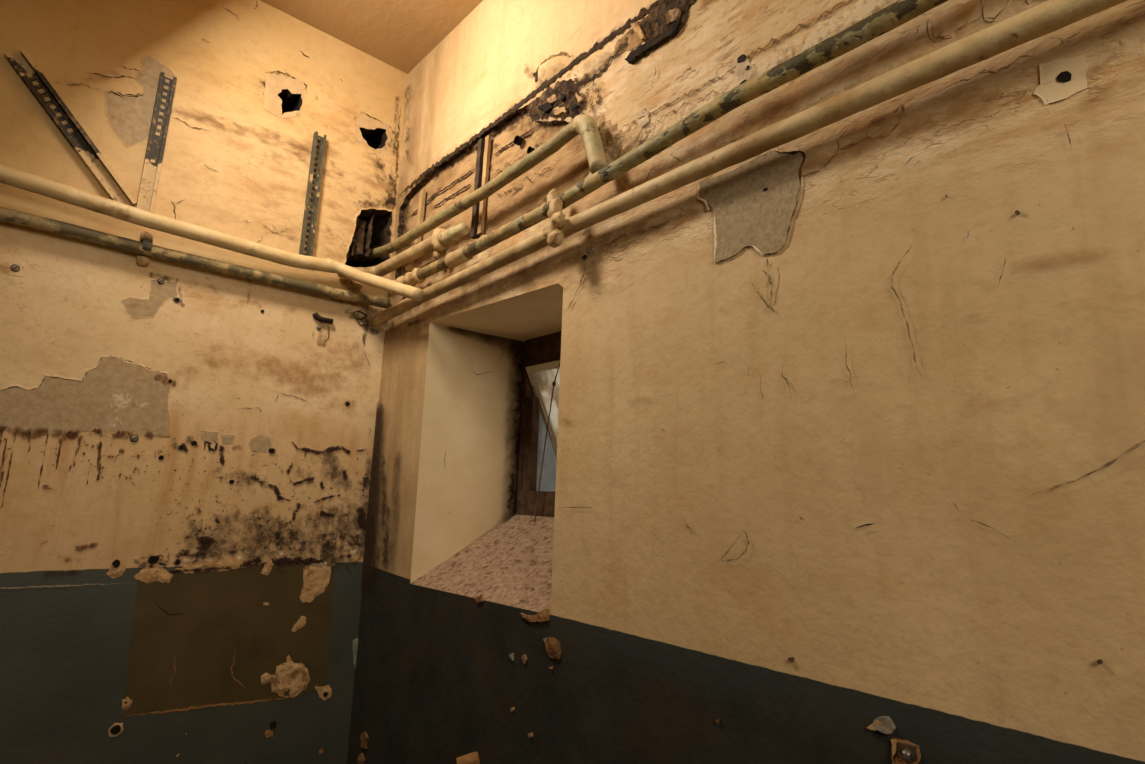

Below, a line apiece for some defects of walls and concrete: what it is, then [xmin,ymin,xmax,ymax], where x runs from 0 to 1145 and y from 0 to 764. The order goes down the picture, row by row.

leakage [757,0,896,76]
peeling [91,55,179,148]
spalling [263,70,307,118]
spalling [343,70,656,279]
peeling [697,105,902,265]
peeling [120,273,180,319]
crack [891,245,924,384]
peeling [0,355,172,438]
leakage [135,406,389,586]
crack [1032,440,1145,495]
peeling [107,542,362,632]
peeling [261,655,332,701]